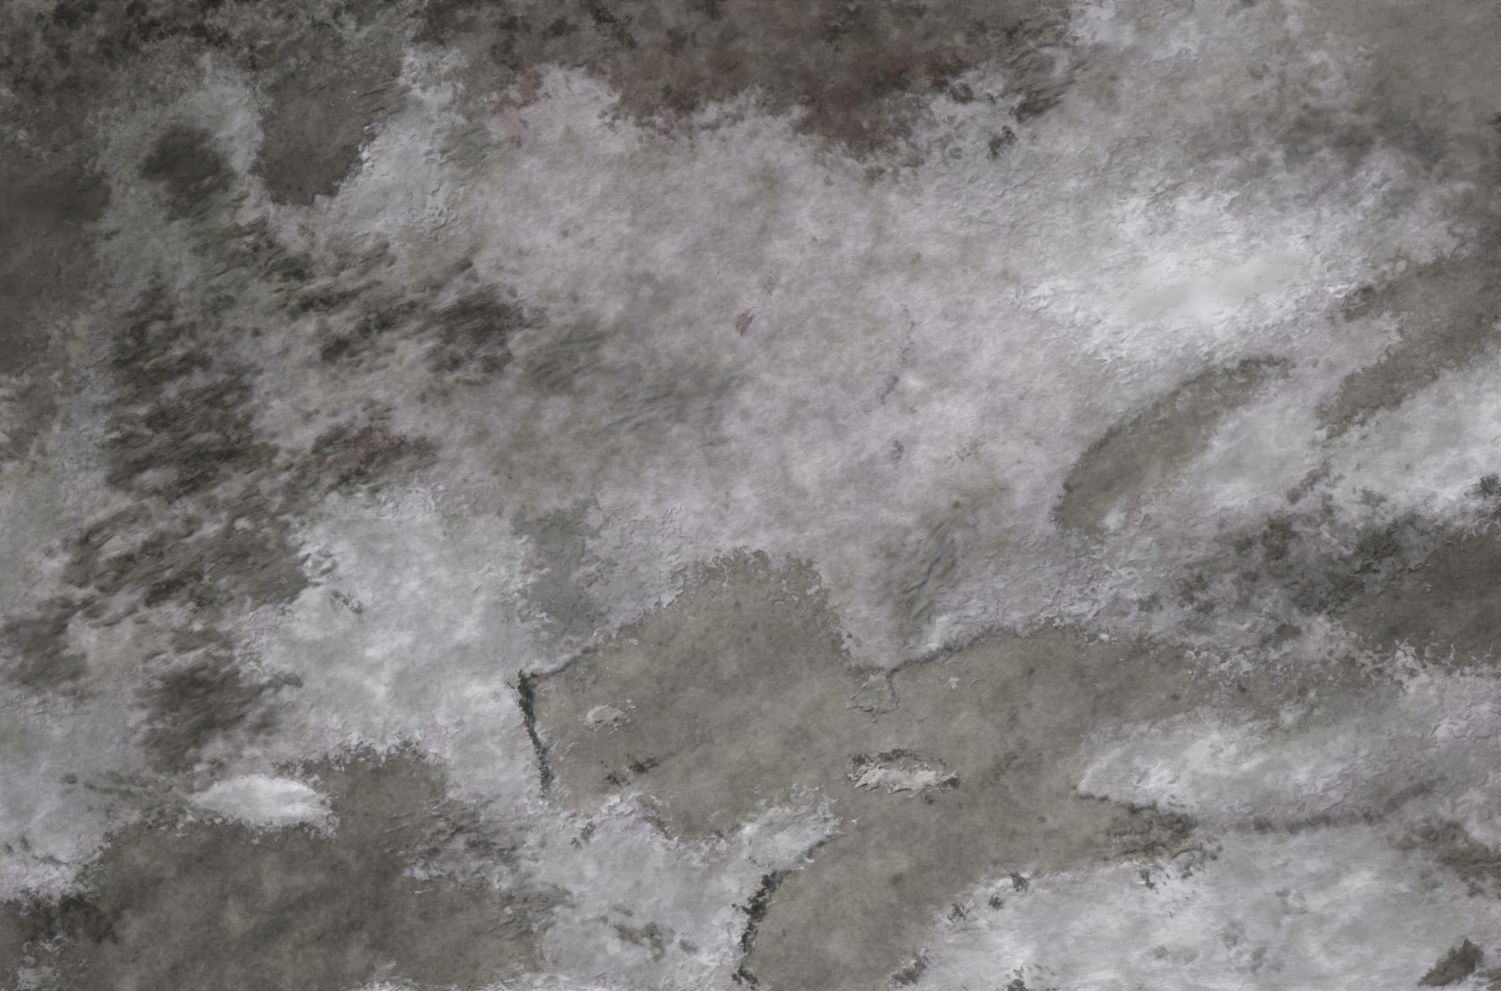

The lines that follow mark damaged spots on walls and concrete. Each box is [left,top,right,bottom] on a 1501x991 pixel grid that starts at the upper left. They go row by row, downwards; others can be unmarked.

damp [1006,0,1501,385]
flaking render [0,732,627,991]
spalling [330,590,364,623]
crack [505,670,550,801]
flaking render [527,488,1501,991]
damp [871,367,1501,991]